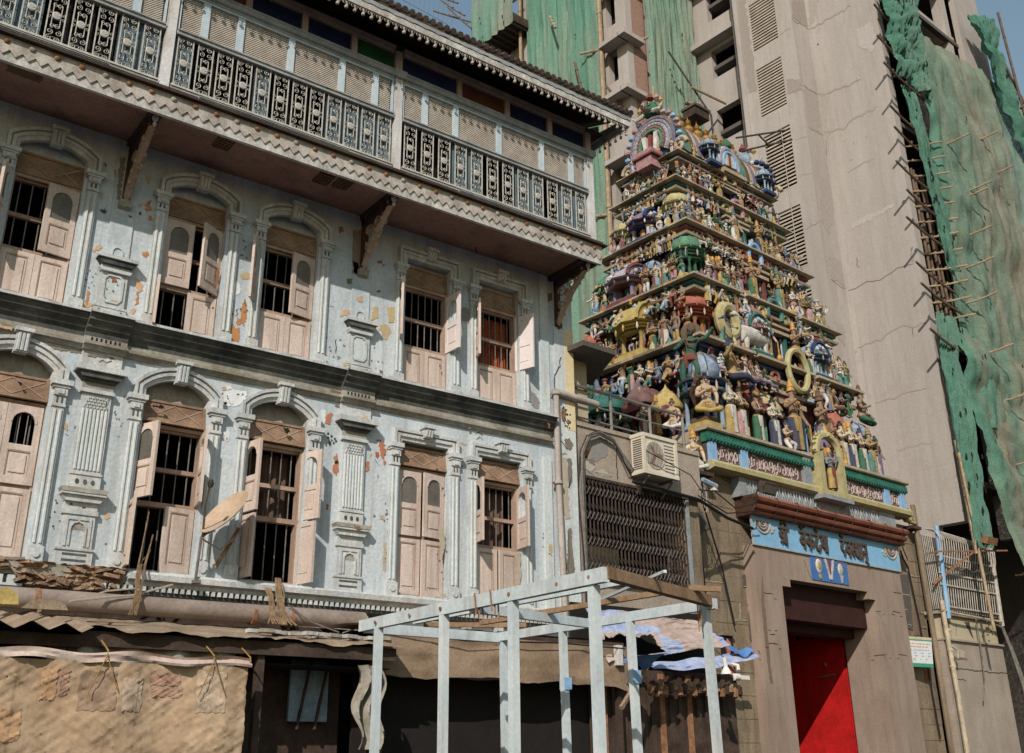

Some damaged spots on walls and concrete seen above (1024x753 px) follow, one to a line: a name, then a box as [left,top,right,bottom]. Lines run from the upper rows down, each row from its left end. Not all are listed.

peeling [131,277,143,315]
peeling [230,272,250,342]
peeling [340,296,395,369]
peeling [222,385,247,407]
peeling [321,409,339,475]
peeling [365,439,388,472]